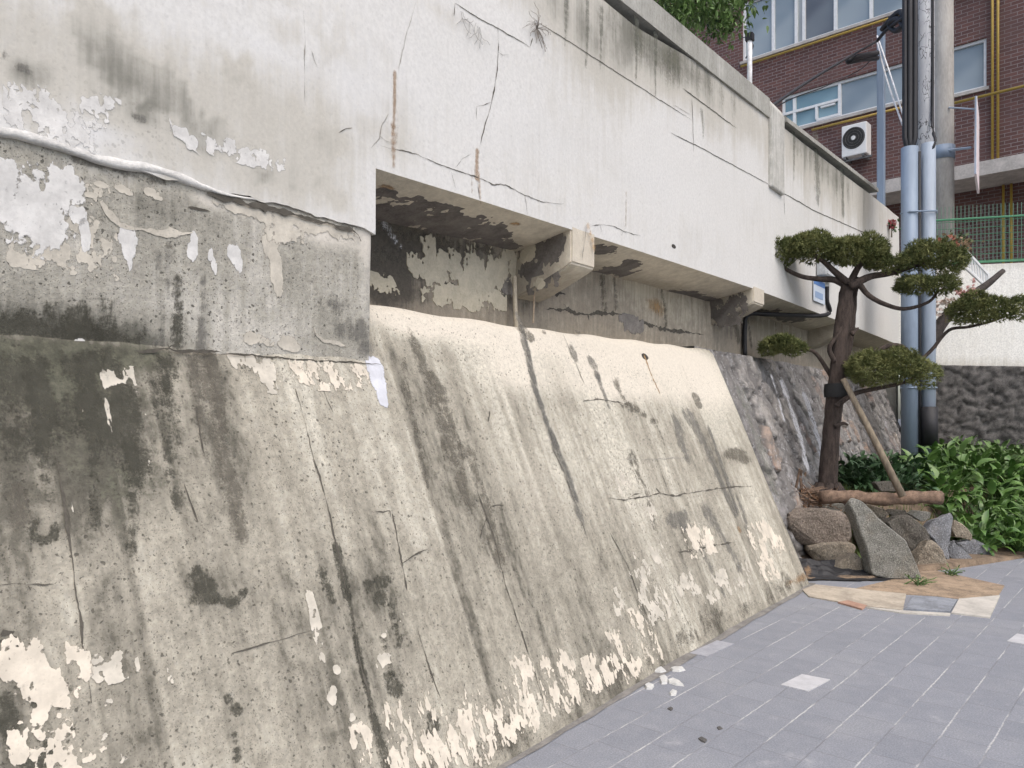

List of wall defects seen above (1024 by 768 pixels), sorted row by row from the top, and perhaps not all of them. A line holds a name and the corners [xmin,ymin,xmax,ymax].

crack [372,41,556,206]
peeling [0,155,163,281]
peeling [376,187,566,323]
crack [0,458,85,651]
water stain [28,519,59,544]
water stain [61,300,119,474]
water stain [123,437,142,553]
water stain [151,275,248,542]
crack [295,376,374,728]
crack [612,457,752,506]
peeling [0,634,140,768]
peeling [348,519,786,768]